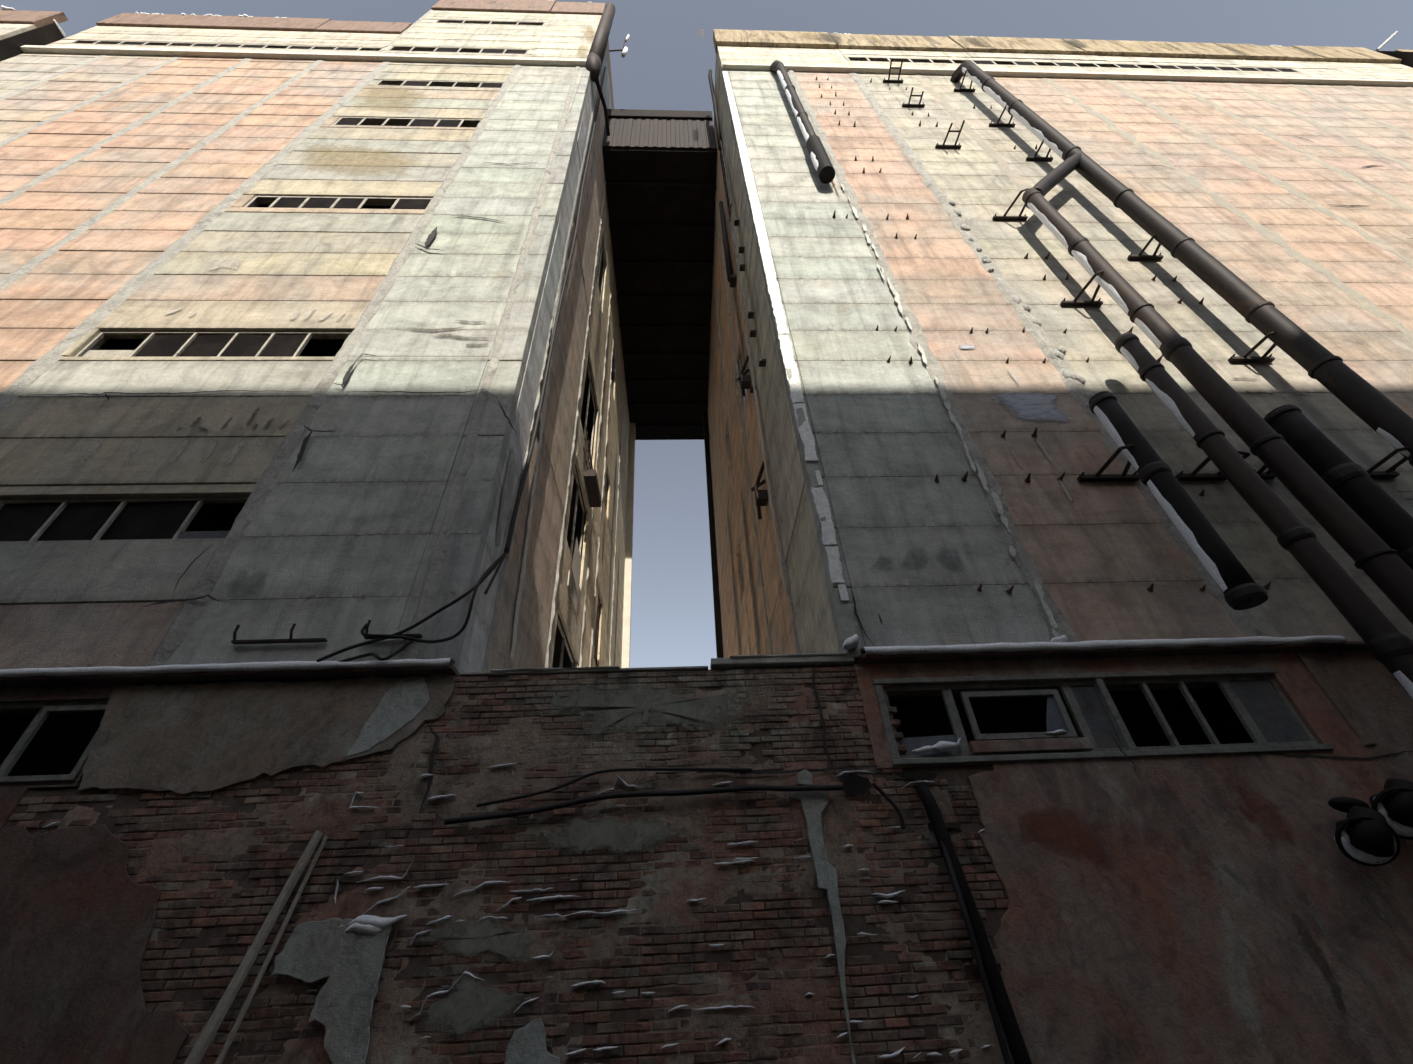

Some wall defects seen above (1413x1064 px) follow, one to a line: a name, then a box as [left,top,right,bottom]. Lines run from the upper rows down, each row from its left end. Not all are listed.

flaking render [78,674,456,795]
flaking render [548,684,742,736]
flaking render [546,815,673,852]
flaking render [417,918,529,961]
flaking render [789,769,872,1064]
flaking render [270,918,392,1064]
flaking render [426,975,514,1035]
flaking render [504,1018,560,1064]